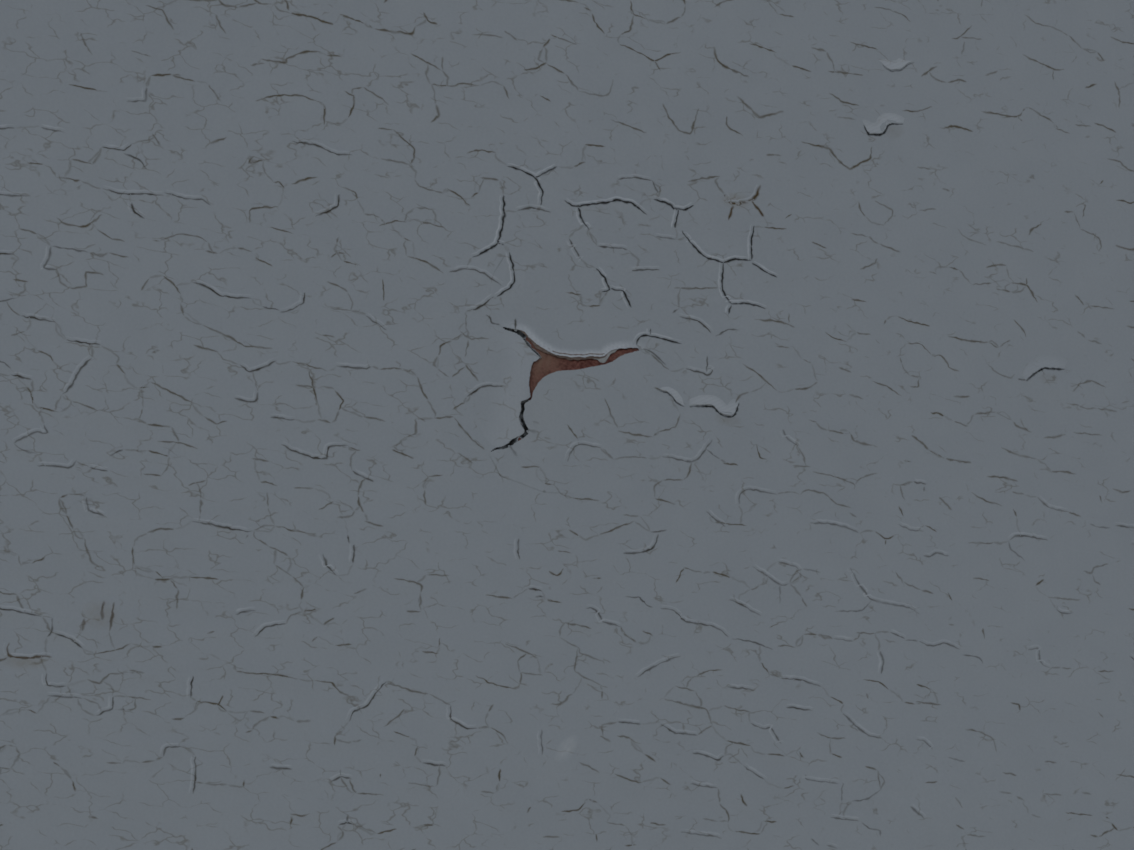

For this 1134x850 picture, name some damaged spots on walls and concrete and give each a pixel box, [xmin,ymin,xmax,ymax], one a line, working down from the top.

crack [68,83,98,91]
crack [125,50,221,103]
crack [145,0,700,135]
crack [713,47,784,136]
crack [749,42,878,120]
crack [902,0,1134,134]
crack [0,87,1134,717]
peeling [473,301,745,494]
crack [106,643,542,850]
crack [561,558,986,850]
crack [965,728,1134,850]